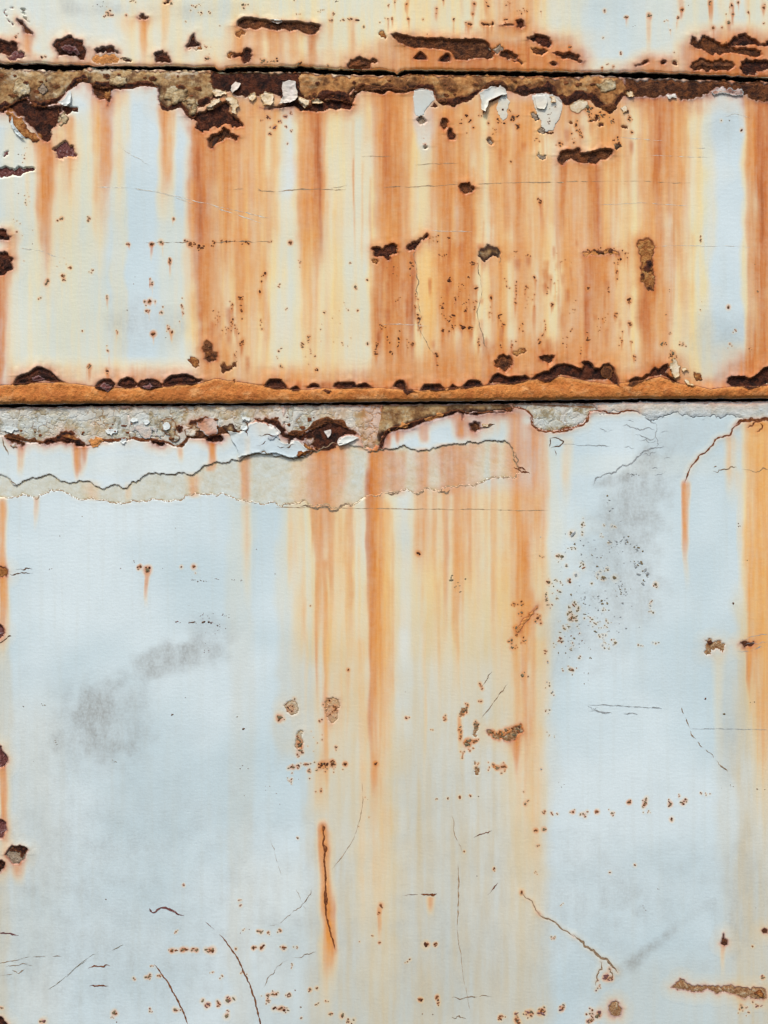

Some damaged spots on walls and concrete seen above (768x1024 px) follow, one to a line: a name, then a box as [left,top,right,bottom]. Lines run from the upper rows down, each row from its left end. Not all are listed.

peeling [417,115,460,146]
spalling [437,83,457,104]
peeling [472,80,634,138]
corrosion [0,0,768,395]
peeling [0,417,519,511]
crack [6,406,768,512]
corrosion [630,561,661,617]
corrosion [650,398,768,871]
corrosion [0,399,644,1024]
corrosion [625,795,652,815]
crack [523,895,625,992]
corrosion [659,916,768,1018]